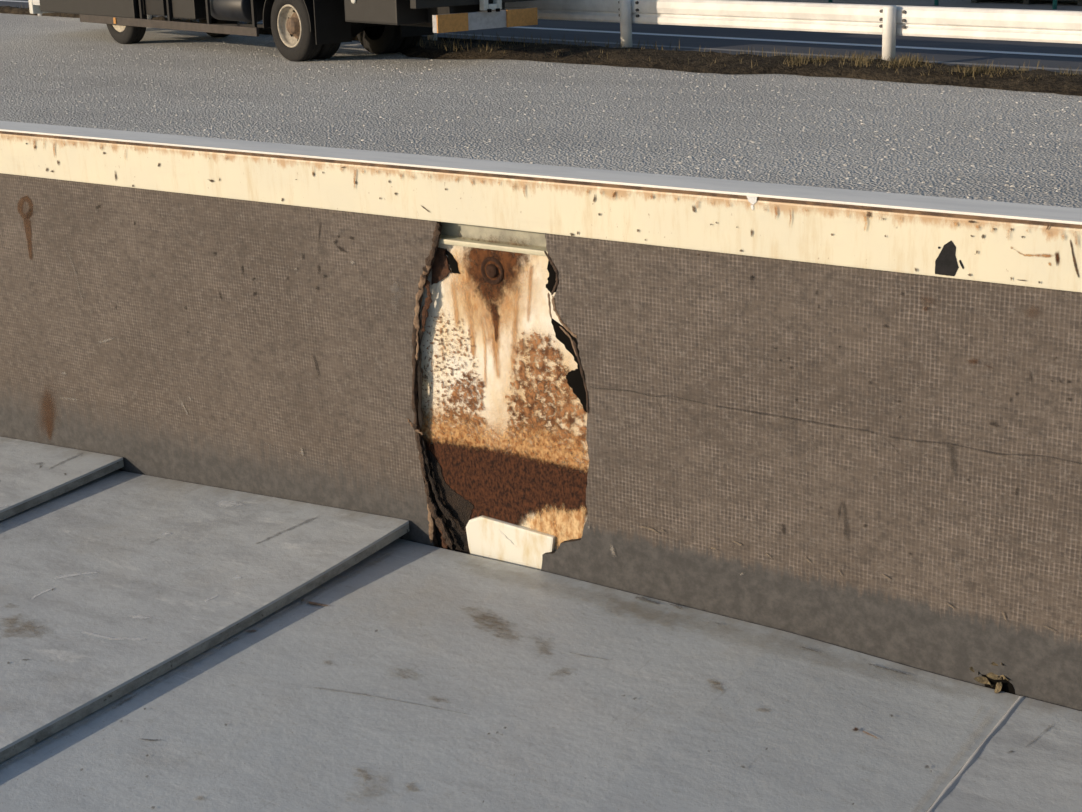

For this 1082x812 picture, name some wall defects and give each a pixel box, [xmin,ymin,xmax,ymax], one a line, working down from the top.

rust [17,196,33,259]
rust [421,239,588,546]
peeling [544,251,589,414]
peeling [935,241,971,276]